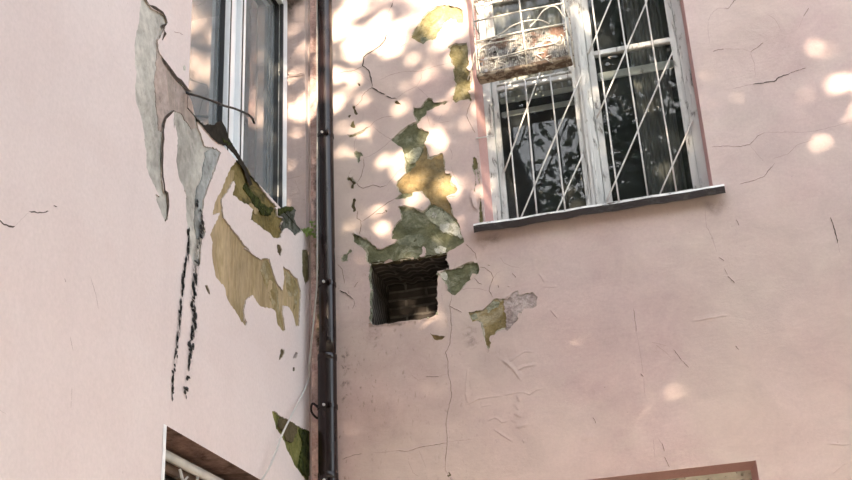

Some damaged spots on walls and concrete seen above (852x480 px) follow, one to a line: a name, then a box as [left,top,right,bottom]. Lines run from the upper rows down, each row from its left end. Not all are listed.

spalling [409,3,464,44]
crack [336,2,448,190]
crack [733,67,806,89]
crack [0,204,57,230]
spalling [134,0,308,331]
spalling [341,43,480,326]
spalling [471,155,484,223]
crack [337,263,359,309]
spalling [469,291,537,353]
crack [342,244,520,480]
spalling [272,411,310,480]